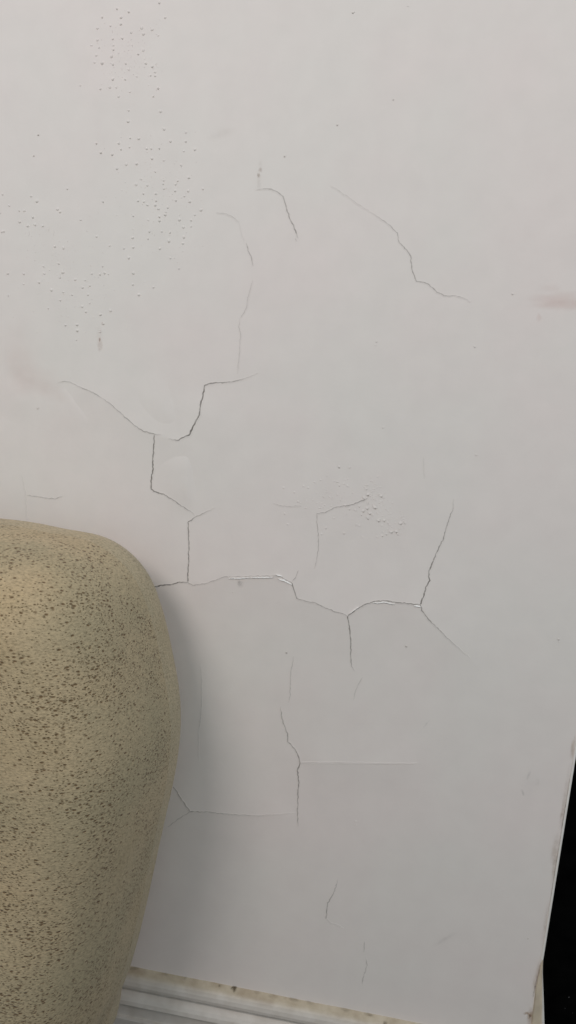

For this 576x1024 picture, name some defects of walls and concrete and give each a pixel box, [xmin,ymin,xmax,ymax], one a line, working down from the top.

crack [256,187,299,242]
crack [330,185,471,302]
crack [57,212,470,671]
crack [280,656,417,827]